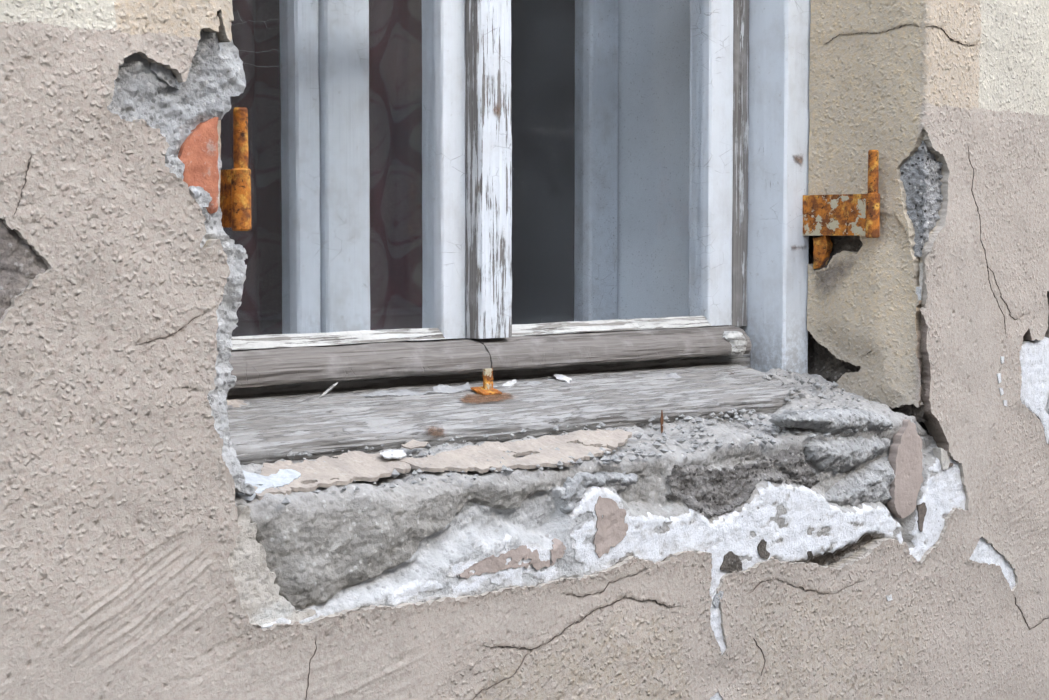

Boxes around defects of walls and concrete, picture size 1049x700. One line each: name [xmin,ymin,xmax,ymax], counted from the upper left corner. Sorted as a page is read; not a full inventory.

crack [826,24,977,46]
flaking render [900,141,943,302]
crack [968,146,1029,333]
flaking render [104,30,632,629]
corrosion [460,392,513,403]
flaking render [808,331,860,383]
flaking render [997,356,1007,407]
flaking render [1019,315,1049,444]
crack [472,555,681,700]
peeling [386,404,966,654]
peeling [970,538,1016,590]